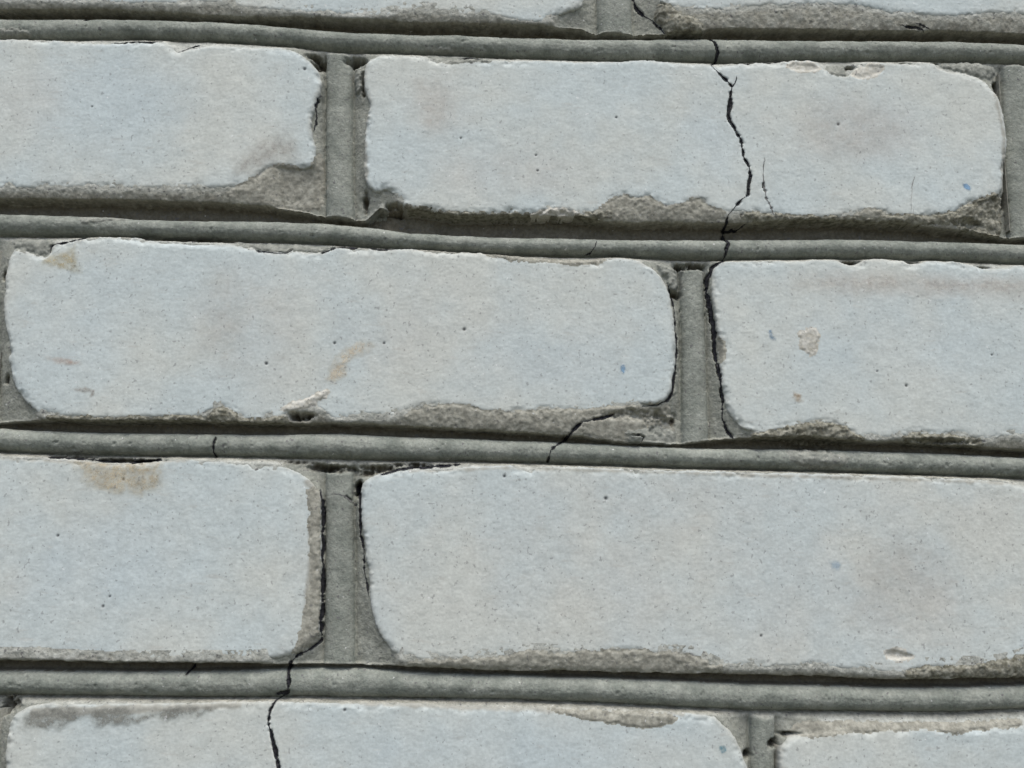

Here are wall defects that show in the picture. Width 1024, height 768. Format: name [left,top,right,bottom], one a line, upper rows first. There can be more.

crack [633,0,666,39]
crack [704,40,786,440]
spalling [740,210,958,230]
crack [642,285,677,407]
crack [548,414,613,460]
crack [267,464,461,768]
spalling [883,646,1024,679]